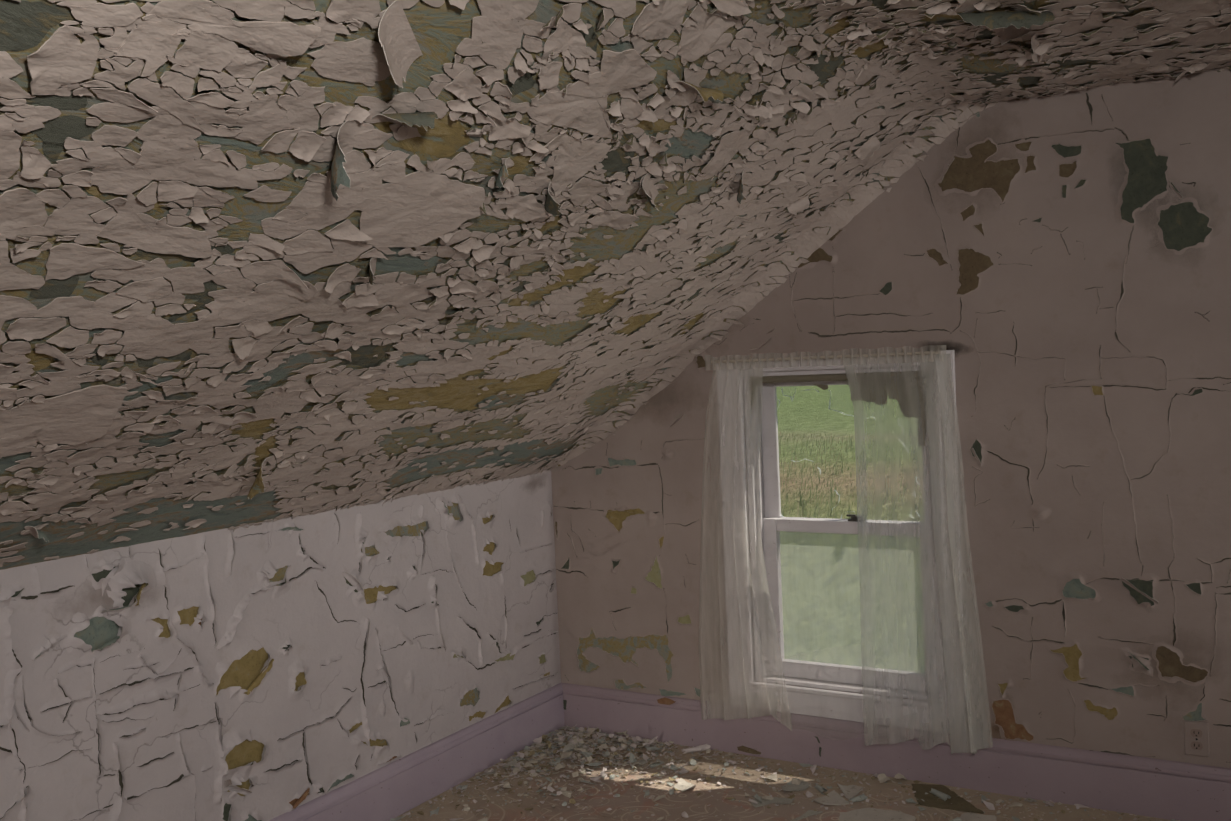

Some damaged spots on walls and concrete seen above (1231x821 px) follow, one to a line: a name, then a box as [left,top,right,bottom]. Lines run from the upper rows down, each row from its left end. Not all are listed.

crack [996,92,1129,146]
crack [789,163,1231,727]
peeling [63,549,156,658]
peeling [138,602,208,645]
peeling [213,633,310,706]
crack [0,489,558,821]
peeling [340,515,432,612]
peeling [477,511,506,581]
crack [554,437,705,633]
peeling [1150,641,1211,687]
peeling [214,726,270,821]
crack [1082,748,1155,758]